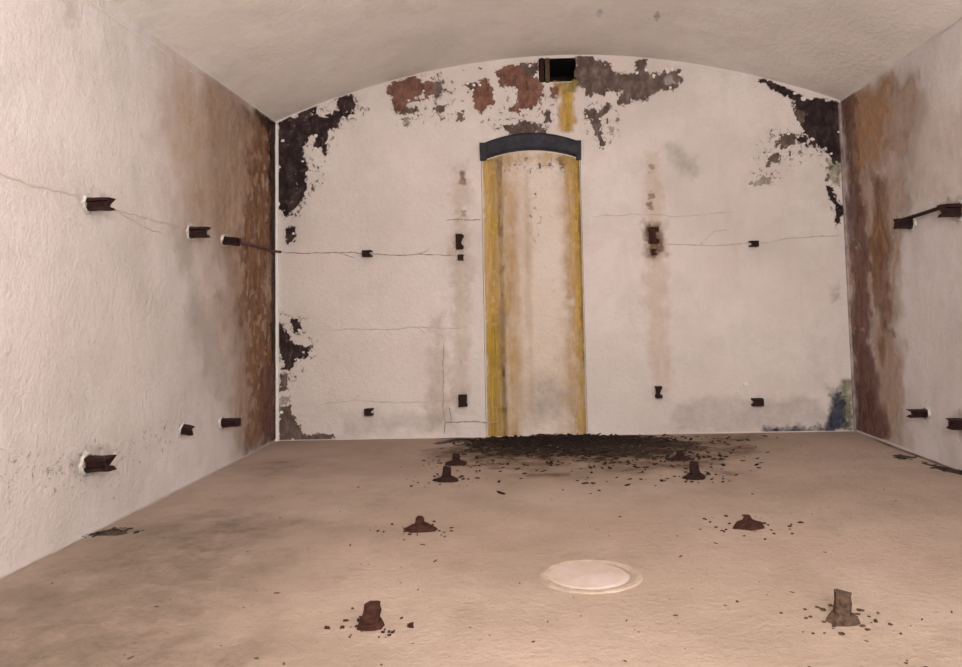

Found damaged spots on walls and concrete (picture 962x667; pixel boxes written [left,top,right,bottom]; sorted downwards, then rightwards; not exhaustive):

peeling [278,94,370,244]
peeling [386,61,559,135]
peeling [573,55,683,150]
peeling [749,78,843,226]
peeling [279,305,335,440]